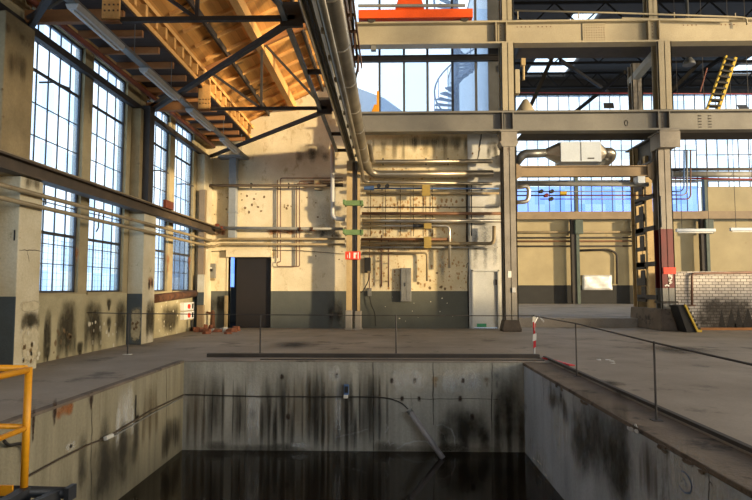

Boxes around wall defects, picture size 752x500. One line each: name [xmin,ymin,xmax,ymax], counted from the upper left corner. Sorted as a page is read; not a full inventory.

leakage [24,313,50,361]
leakage [59,299,124,355]
leakage [95,417,138,497]
leakage [261,389,293,439]
leakage [308,390,324,431]
leakage [337,389,380,443]
spalling [0,360,752,500]
leakage [441,390,525,451]
leakage [575,413,626,500]